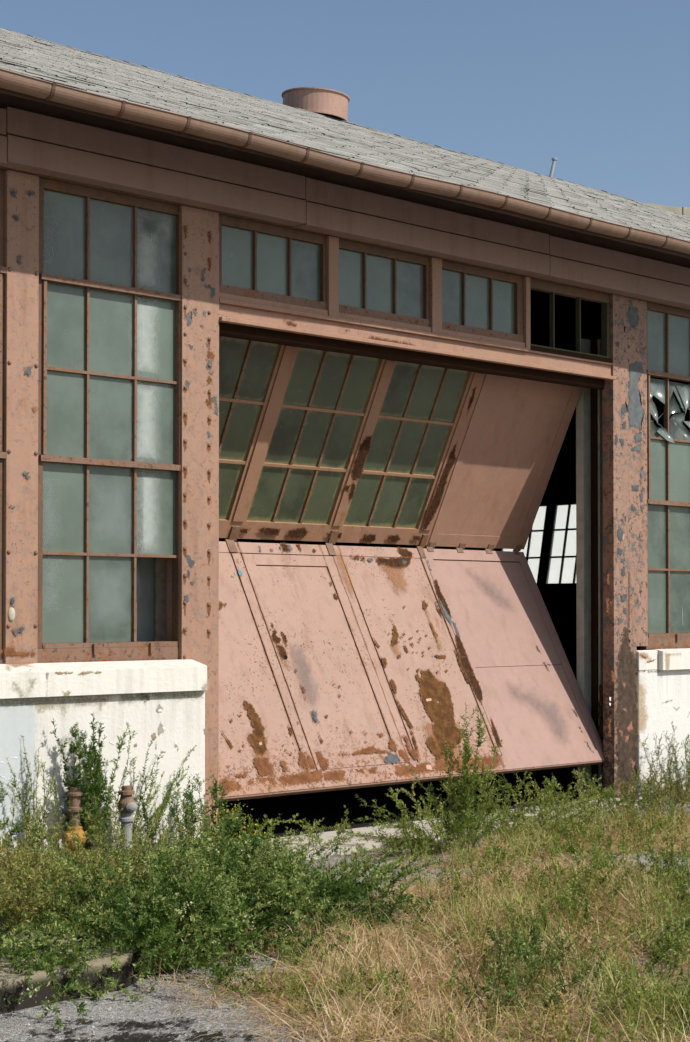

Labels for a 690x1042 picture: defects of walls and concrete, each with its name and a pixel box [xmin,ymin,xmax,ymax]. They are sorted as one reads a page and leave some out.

peeling [205,342,218,414]
peeling [615,362,644,451]
peeling [184,555,197,602]
rust [240,527,309,541]
rust [340,435,458,590]
rust [218,560,503,796]